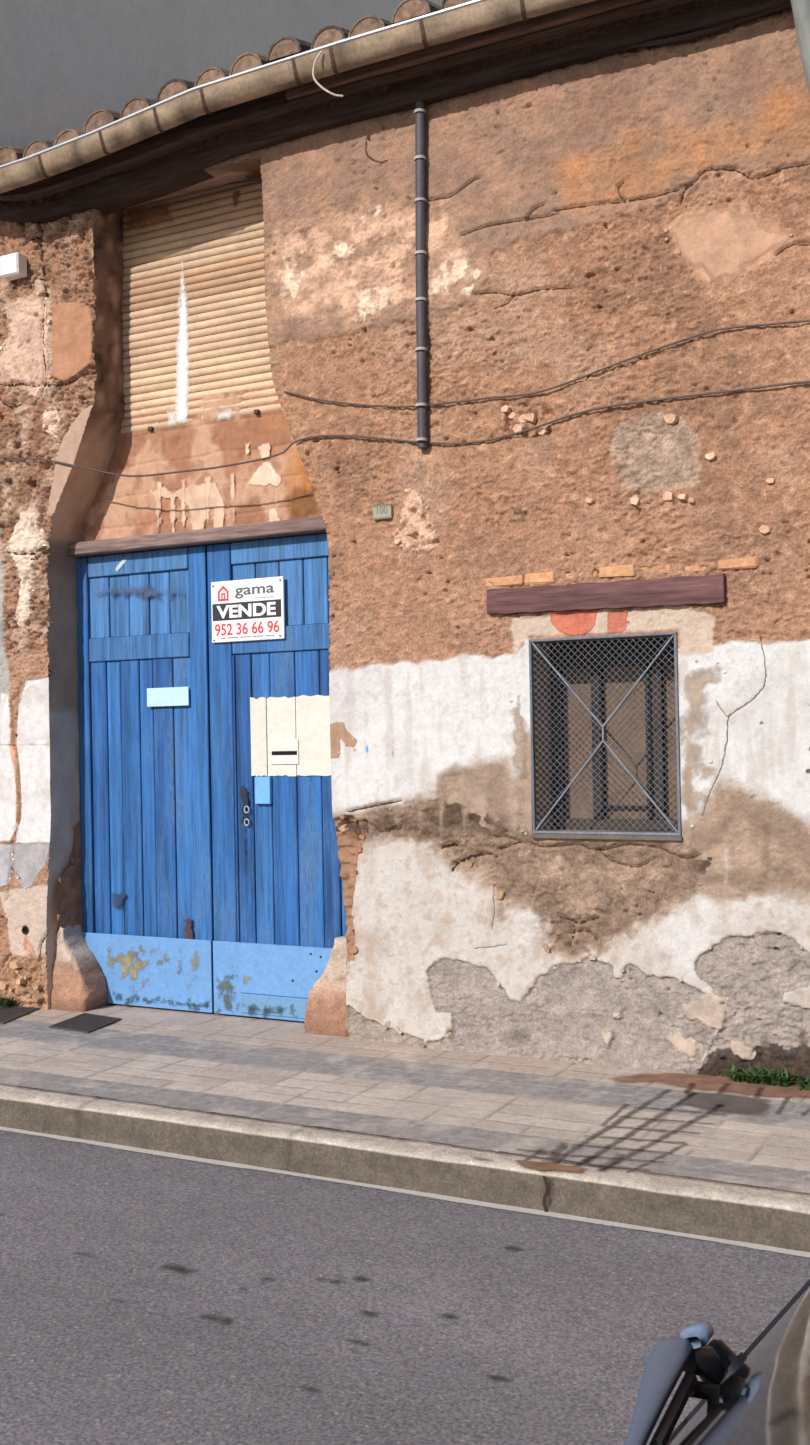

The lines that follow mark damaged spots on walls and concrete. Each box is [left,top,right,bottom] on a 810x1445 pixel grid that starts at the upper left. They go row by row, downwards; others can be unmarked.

crack [429,178,480,201]
crack [461,164,810,236]
flaking render [246,443,281,486]
flaking render [269,508,280,522]
crack [702,633,766,815]
crack [441,835,700,949]
flaking render [335,700,810,1075]